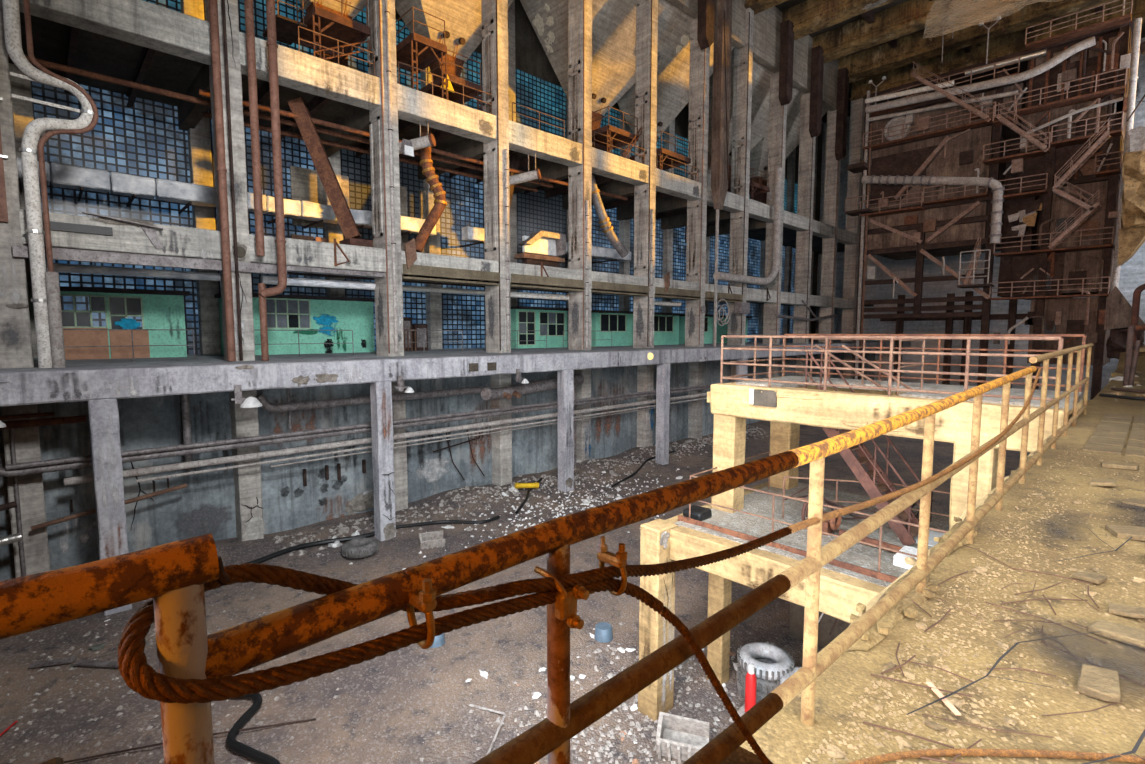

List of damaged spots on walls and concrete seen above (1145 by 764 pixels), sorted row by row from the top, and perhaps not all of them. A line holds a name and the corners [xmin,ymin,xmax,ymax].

spalling [0,406,16,581]
spalling [37,401,99,571]
spalling [117,373,374,553]
water stain [318,434,356,520]
spalling [405,375,492,503]
spalling [511,371,558,478]
spalling [591,366,637,459]
spalling [653,362,689,445]
spalling [702,360,731,436]
spalling [747,353,844,400]
spalling [861,350,875,380]